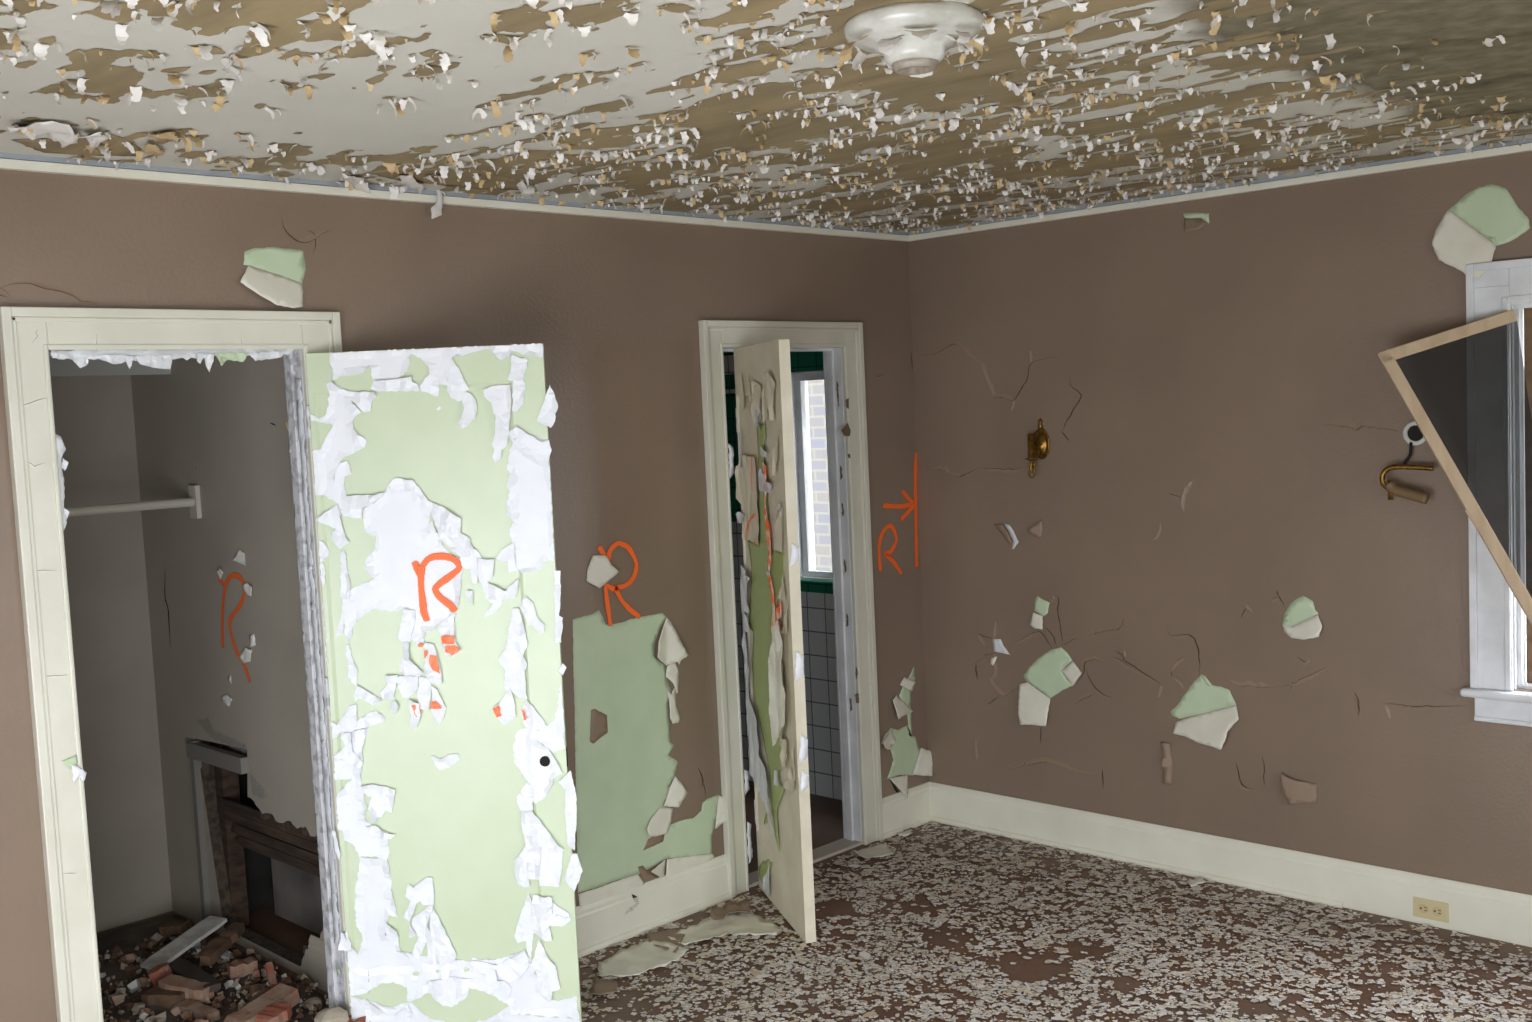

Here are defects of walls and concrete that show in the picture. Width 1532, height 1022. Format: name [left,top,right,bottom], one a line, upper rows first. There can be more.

peeling [0,0,1532,235]
crack [0,280,97,352]
peeling [240,247,306,308]
peeling [1432,184,1530,279]
spalling [836,381,851,436]
peeling [728,371,809,896]
peeling [1282,596,1322,640]
peeling [210,343,725,1022]
peeling [882,667,933,799]
peeling [1018,647,1082,726]
peeling [1160,674,1239,784]
crack [1234,756,1265,791]